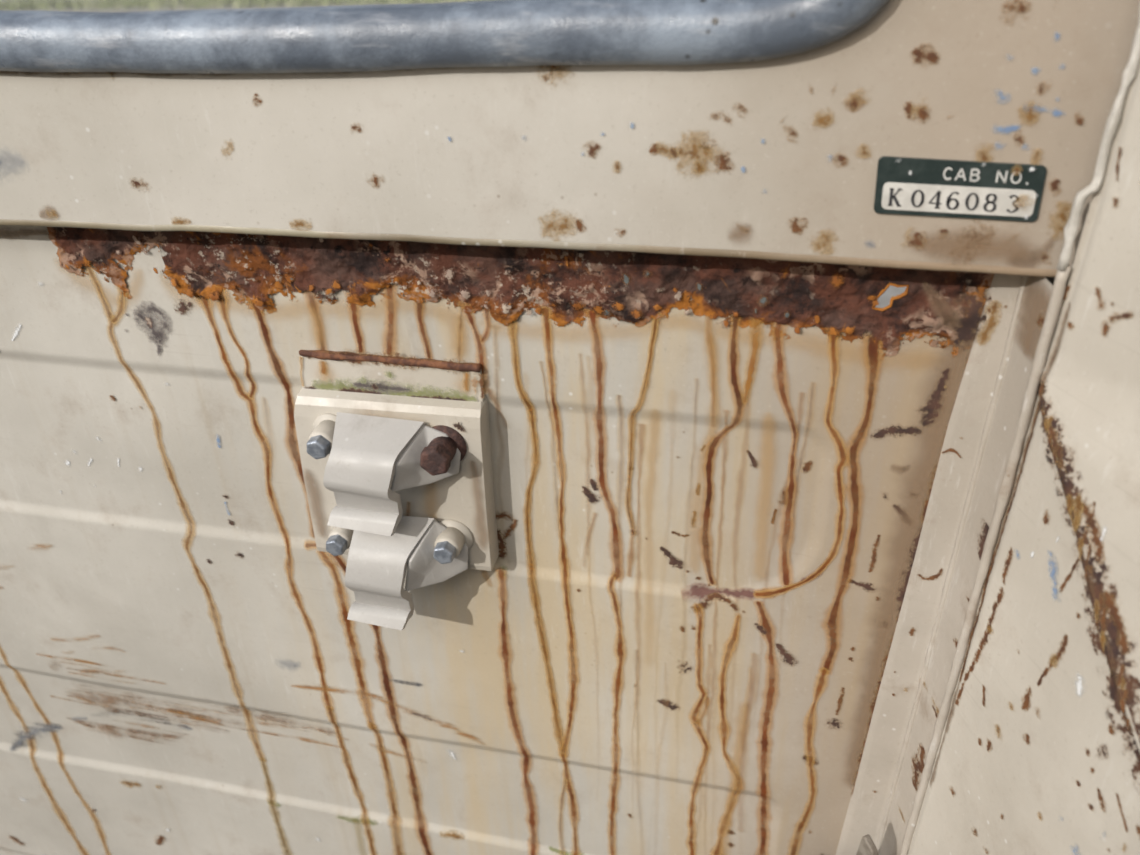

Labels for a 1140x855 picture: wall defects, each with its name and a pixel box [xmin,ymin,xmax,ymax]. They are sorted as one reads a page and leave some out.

rust [912,45,939,63]
rust [815,115,831,127]
rust [904,102,929,121]
rust [1019,104,1037,123]
rust [649,133,731,174]
rust [1014,150,1041,174]
rust [0,179,1072,855]
rust [912,285,1140,790]
rust [1089,789,1140,835]